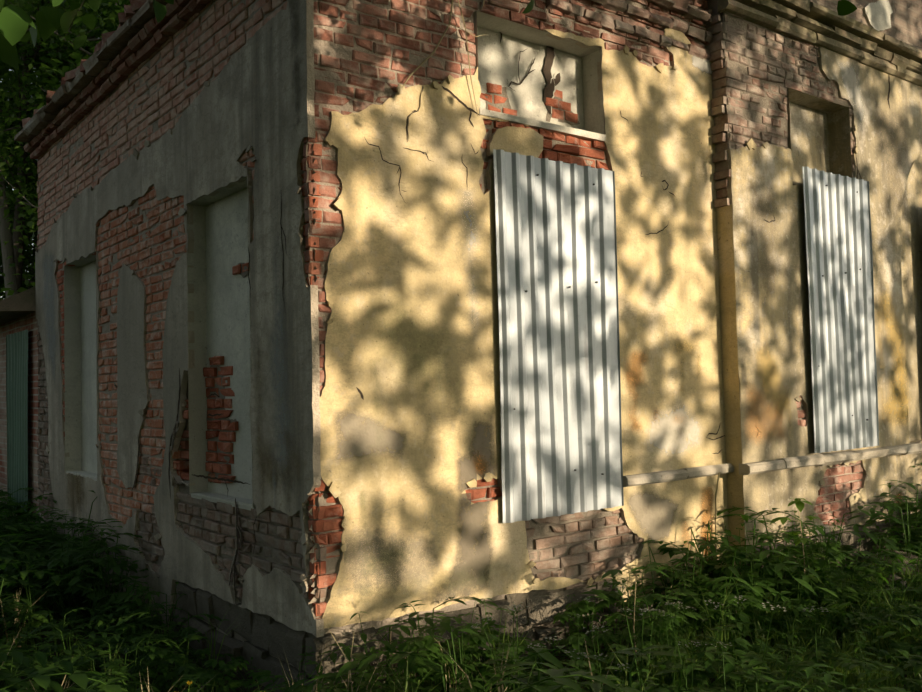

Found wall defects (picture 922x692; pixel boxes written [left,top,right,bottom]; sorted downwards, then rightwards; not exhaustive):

peeling [35,0,287,252]
peeling [294,0,709,394]
peeling [720,11,858,178]
flaking render [92,186,359,619]
flaking render [525,509,643,590]
flaking render [814,460,864,526]